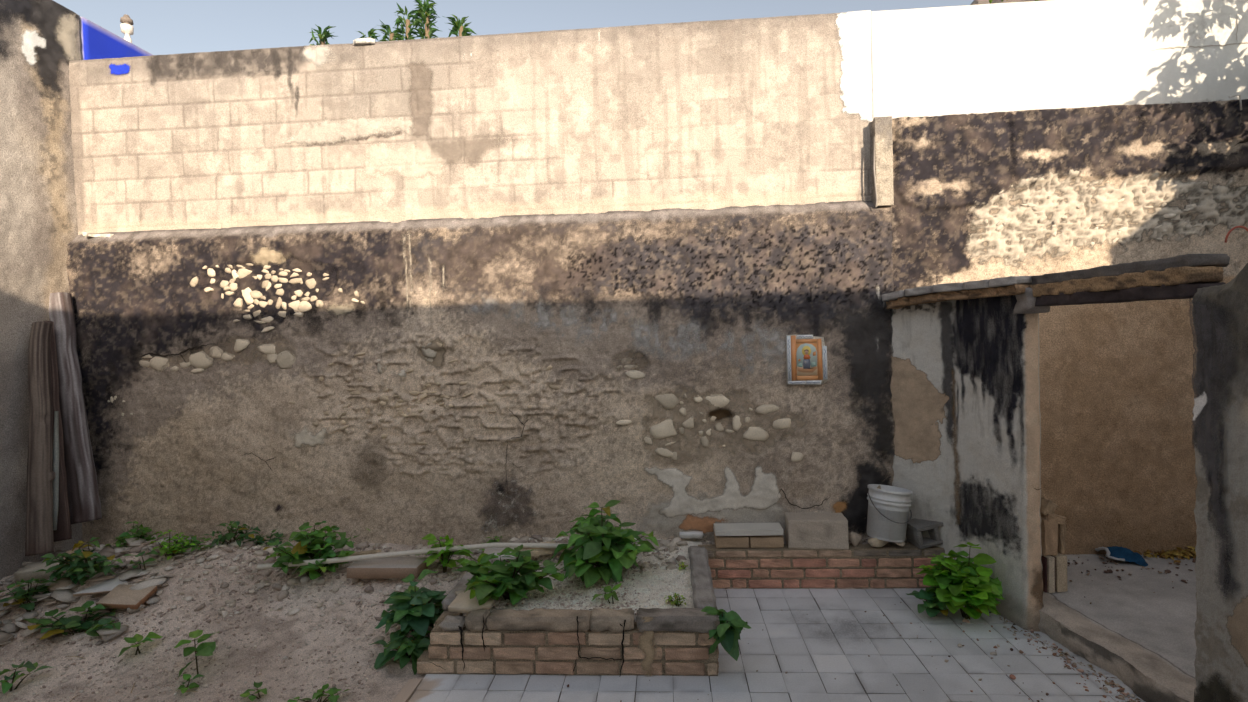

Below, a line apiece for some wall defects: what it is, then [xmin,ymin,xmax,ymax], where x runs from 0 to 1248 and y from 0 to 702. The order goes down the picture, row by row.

damp [409,62,513,166]
flaking render [139,247,365,373]
flaking render [615,352,648,379]
damp [66,99,1248,535]
flaking render [616,386,807,536]
peeling [890,356,949,463]
damp [954,477,1021,555]
damp [1189,298,1248,597]